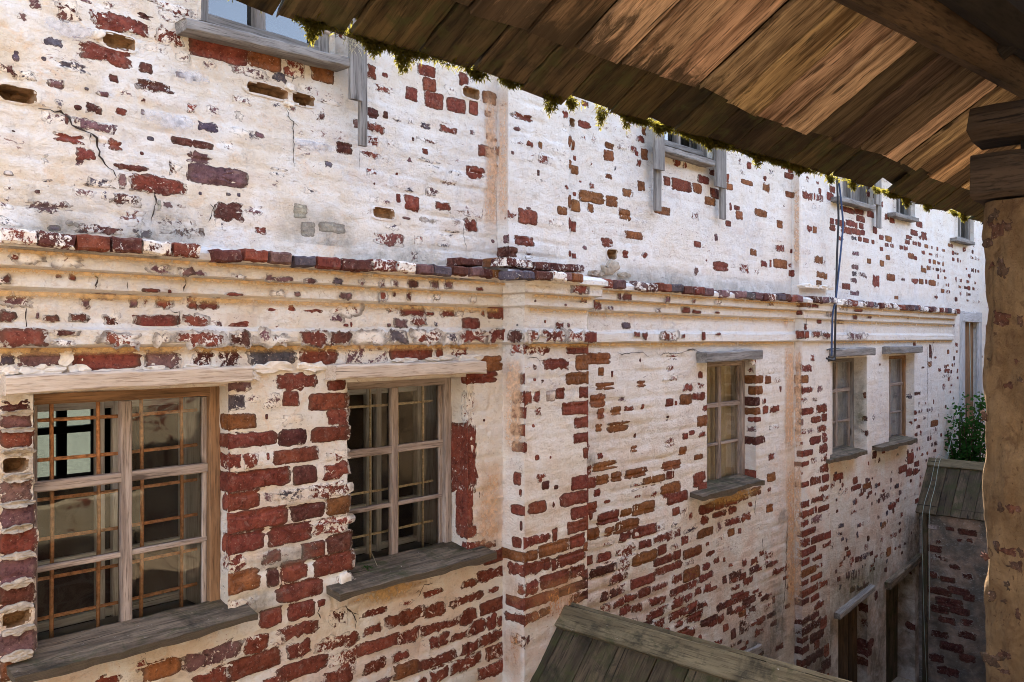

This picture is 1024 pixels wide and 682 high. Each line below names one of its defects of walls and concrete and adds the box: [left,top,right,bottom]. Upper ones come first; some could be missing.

crack [38,108,117,178]
peeling [0,0,346,239]
crack [286,75,298,163]
peeling [367,63,497,118]
peeling [663,158,1013,341]
peeling [0,249,959,682]